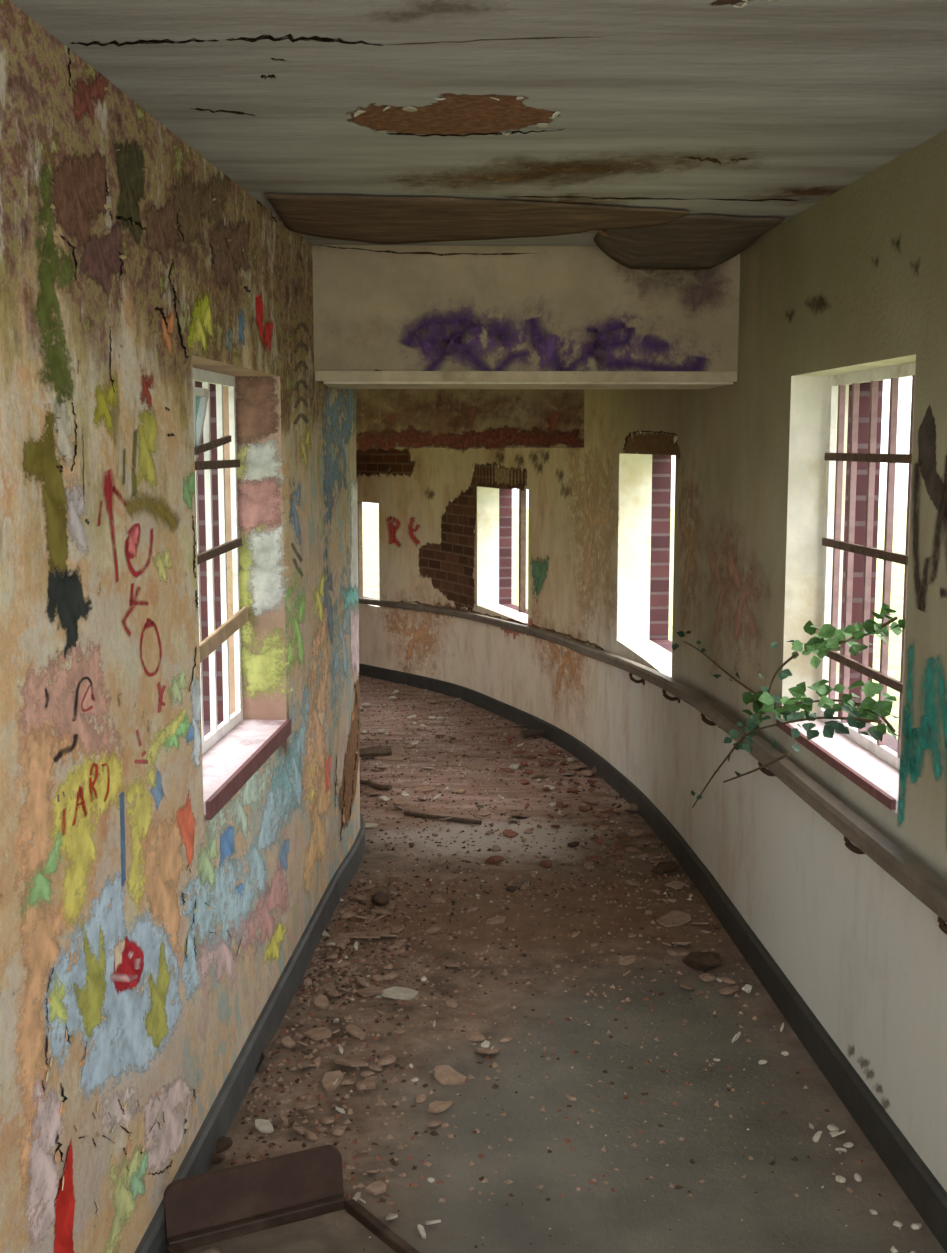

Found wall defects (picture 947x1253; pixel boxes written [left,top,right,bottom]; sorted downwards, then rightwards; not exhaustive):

peeling [66,47,109,122]
crack [192,108,256,116]
crack [70,34,587,79]
peeling [346,93,564,137]
peeling [50,140,252,301]
peeling [55,400,78,469]
spalling [356,410,584,611]
peeling [335,680,361,841]
peeling [182,893,212,962]
peeling [42,968,68,1115]
peeling [53,1092,165,1207]
flaking render [255,1119,274,1133]